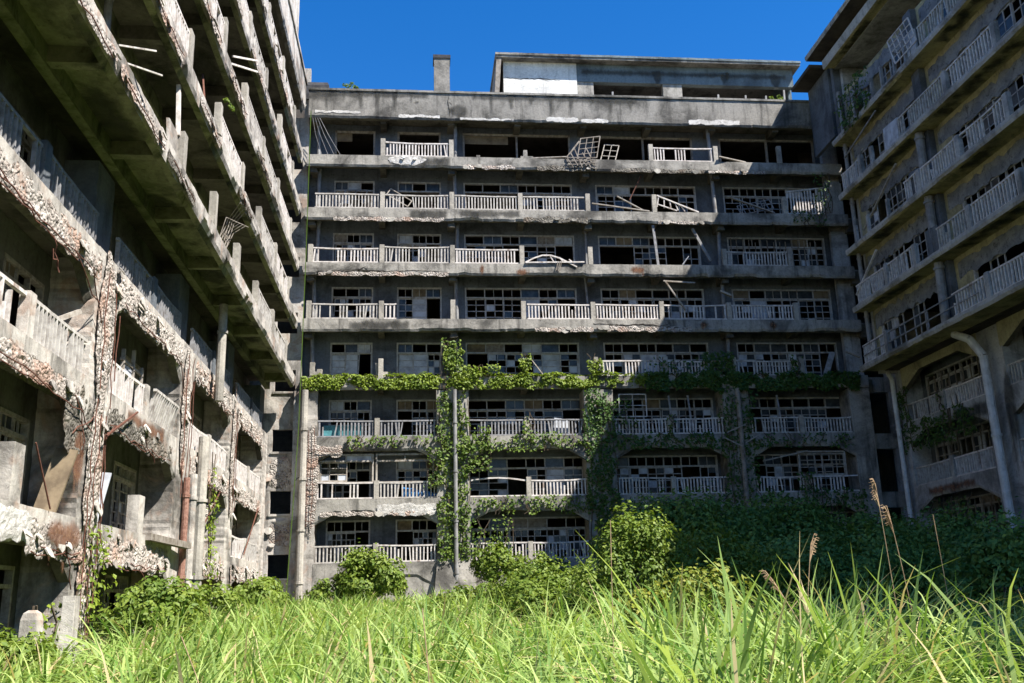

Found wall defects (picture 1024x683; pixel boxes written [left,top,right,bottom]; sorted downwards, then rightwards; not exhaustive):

spalling [0,147,263,642]
spalling [305,421,436,539]